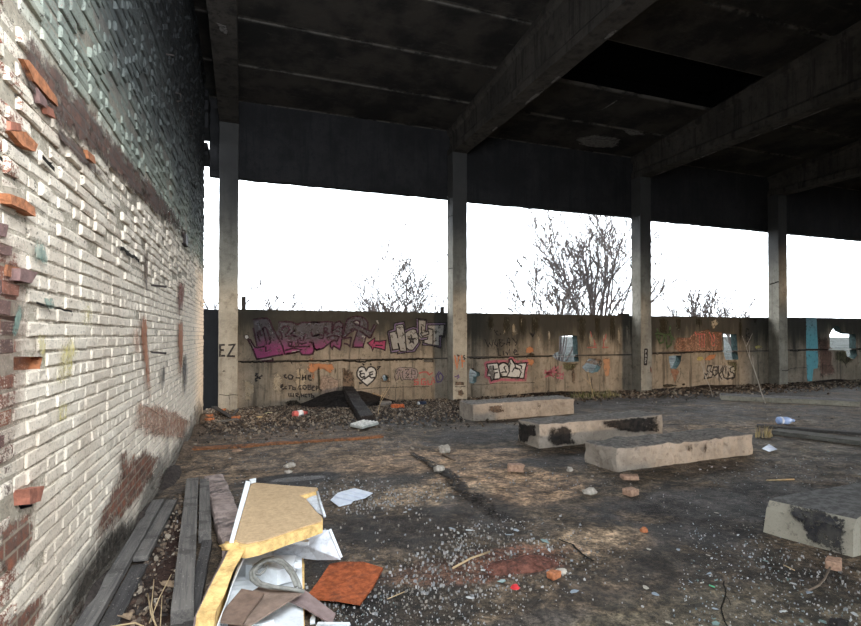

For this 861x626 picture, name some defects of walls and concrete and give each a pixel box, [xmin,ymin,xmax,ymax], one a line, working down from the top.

spalling [6,121,38,152]
spalling [18,35,184,237]
spalling [0,193,36,217]
peeling [0,223,38,321]
spalling [13,357,43,370]
spalling [138,404,190,438]
spalling [94,448,158,539]